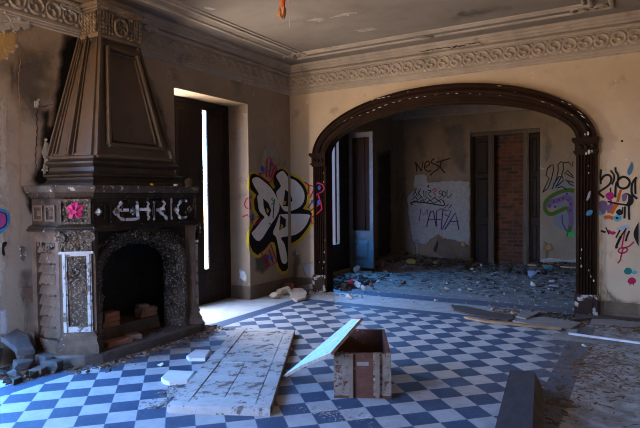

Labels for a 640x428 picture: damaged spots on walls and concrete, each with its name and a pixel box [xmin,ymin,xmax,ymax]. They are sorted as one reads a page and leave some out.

crack [421,41,488,52]
flaking render [436,237,470,258]